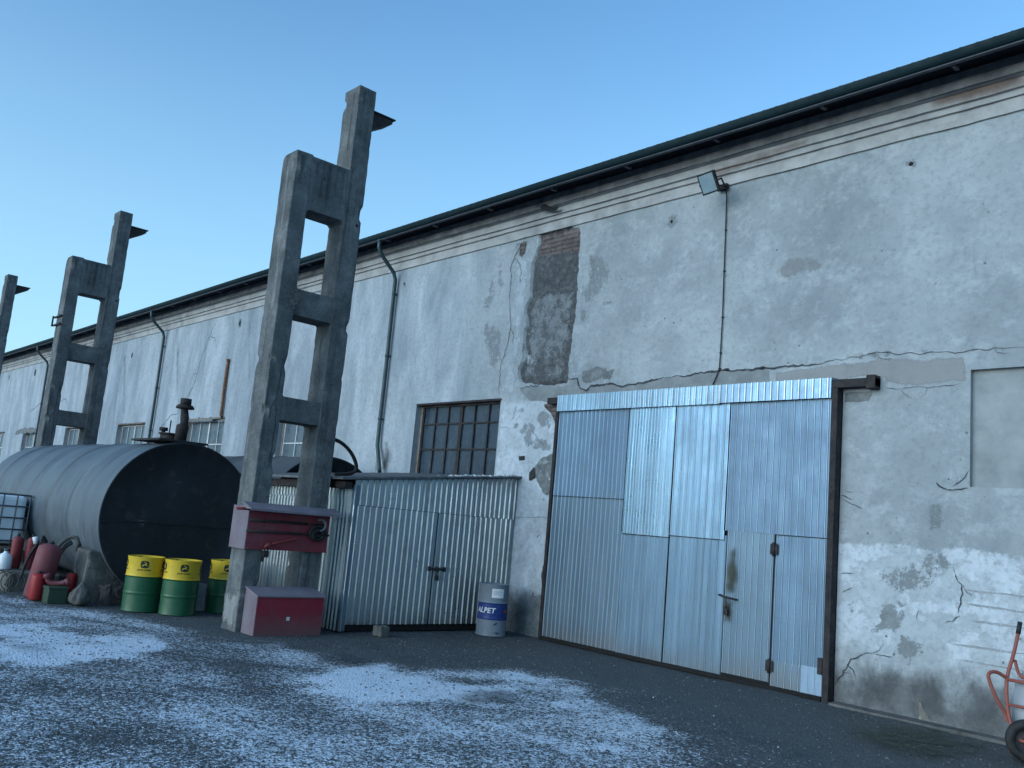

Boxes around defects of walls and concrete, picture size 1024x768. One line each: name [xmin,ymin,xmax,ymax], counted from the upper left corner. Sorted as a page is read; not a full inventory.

crack [498,239,525,389]
flaking render [484,227,818,495]
crack [783,347,1012,367]
crack [936,473,967,491]
peeling [871,555,948,663]
crack [945,570,971,623]
crack [835,647,890,684]